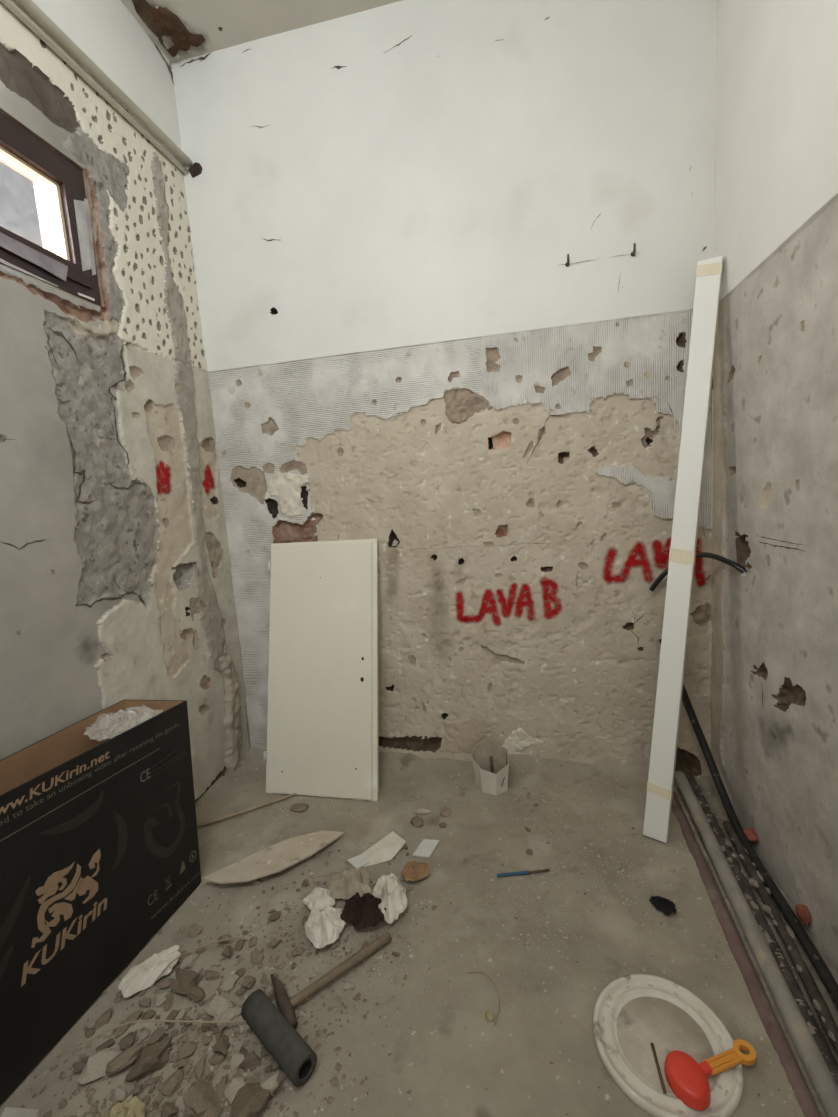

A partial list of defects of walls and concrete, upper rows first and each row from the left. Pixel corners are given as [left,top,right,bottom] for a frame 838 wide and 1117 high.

spalling [132,0,205,84]
spalling [113,365,145,400]
spalling [132,332,687,764]
spalling [677,524,712,776]